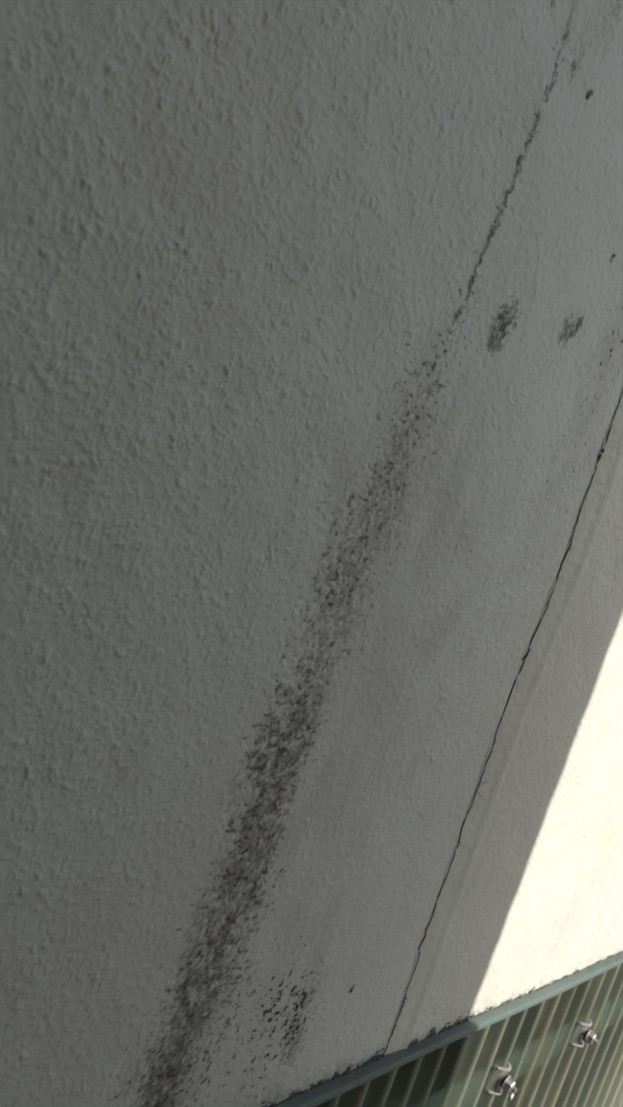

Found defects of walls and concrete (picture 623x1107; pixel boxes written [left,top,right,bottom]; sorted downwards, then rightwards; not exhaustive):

damp [203,658,323,917]
crack [383,392,623,1057]
damp [407,951,622,1048]